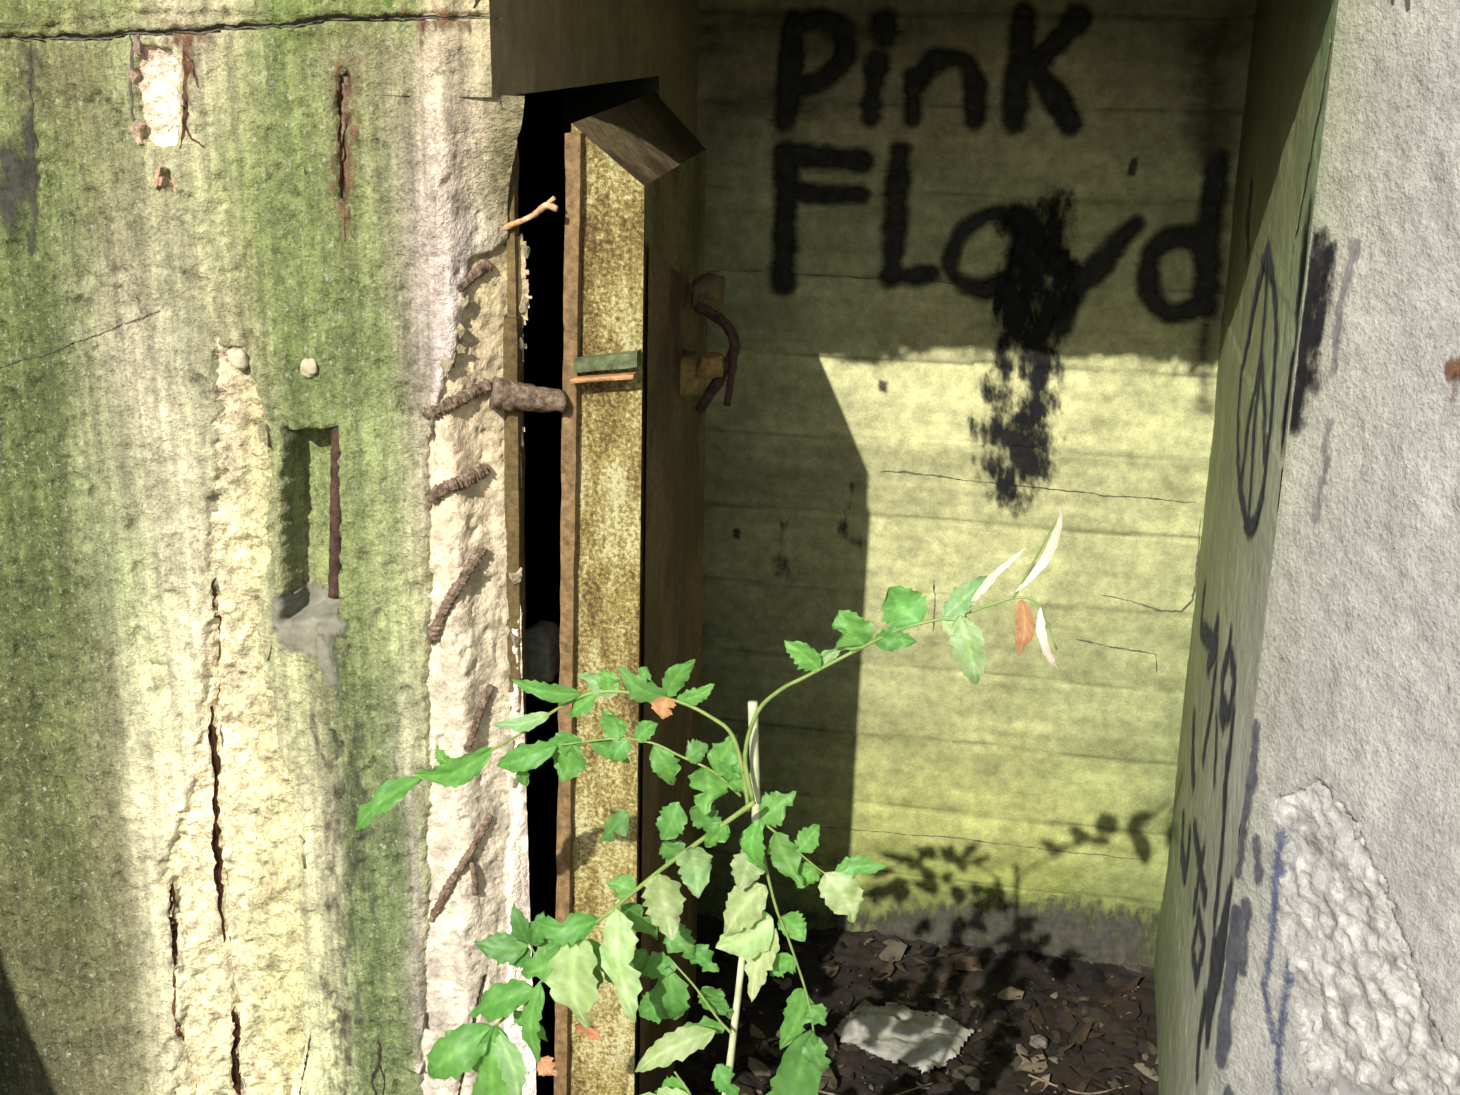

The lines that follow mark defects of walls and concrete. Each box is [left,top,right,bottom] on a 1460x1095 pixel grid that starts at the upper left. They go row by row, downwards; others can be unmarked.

spalling [127,34,187,147]
rust [165,24,205,106]
crack [1,0,502,167]
spalling [154,167,175,192]
rust [330,60,360,257]
crack [208,578,231,943]
crack [168,883,197,1087]
crack [231,1006,241,1095]
crack [299,1034,311,1094]